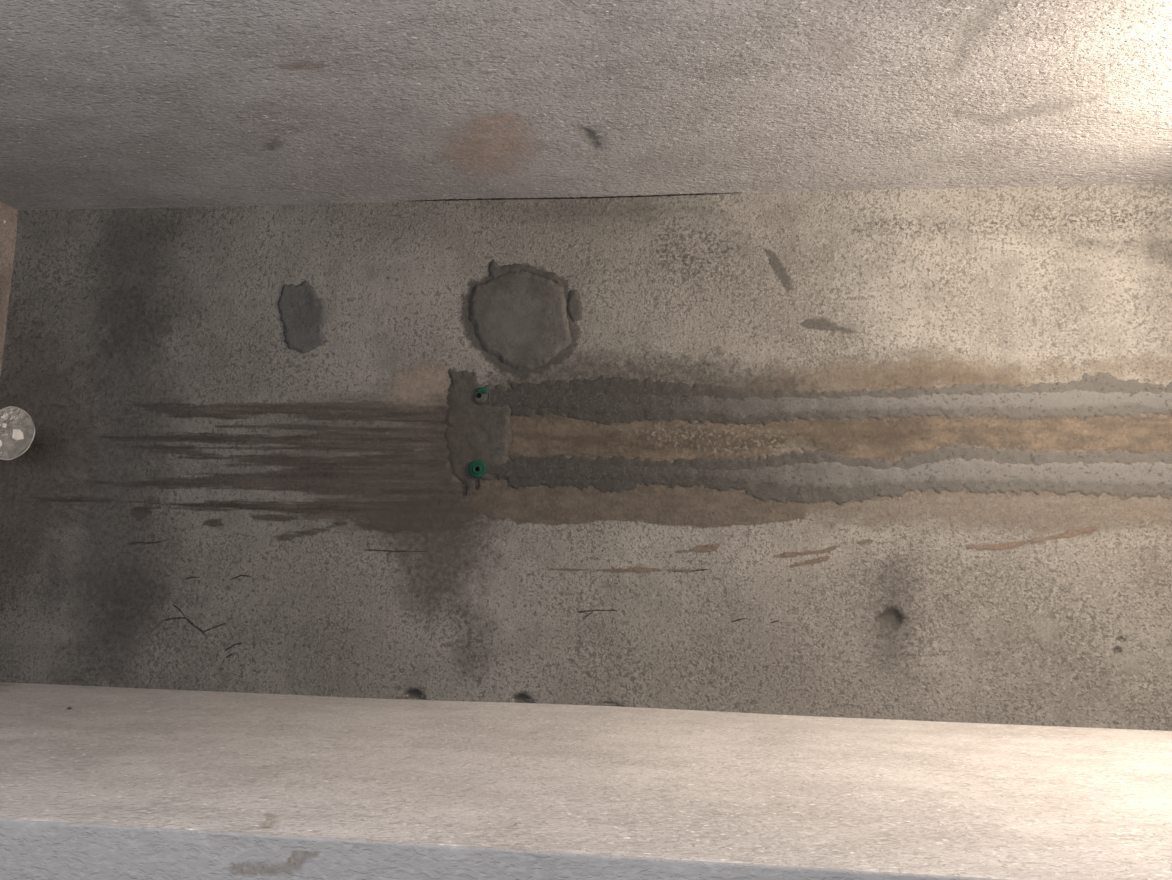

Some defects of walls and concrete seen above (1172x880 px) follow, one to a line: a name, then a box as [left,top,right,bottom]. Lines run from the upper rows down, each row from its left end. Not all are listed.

rust [505,412,1172,464]
damp [95,402,489,611]
rust [469,479,1172,550]
rust [677,544,719,553]
rust [774,545,840,567]
crack [162,604,244,658]